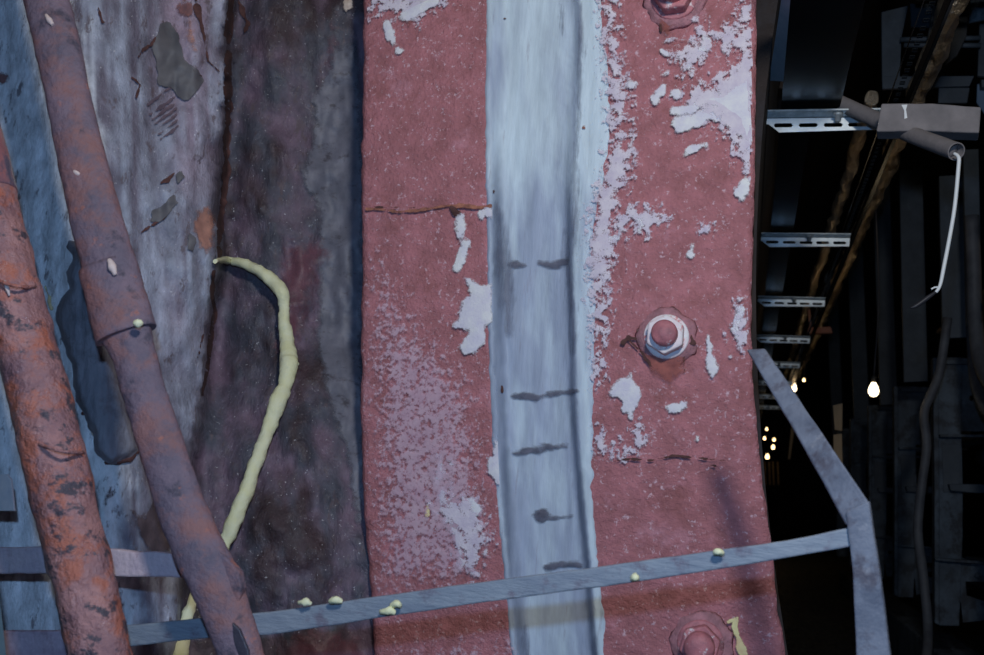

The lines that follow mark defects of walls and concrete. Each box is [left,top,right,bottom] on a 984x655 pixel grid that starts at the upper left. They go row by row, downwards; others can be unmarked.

spalling [138,21,204,100]
peeling [367,0,455,54]
peeling [650,0,754,182]
crack [365,203,492,216]